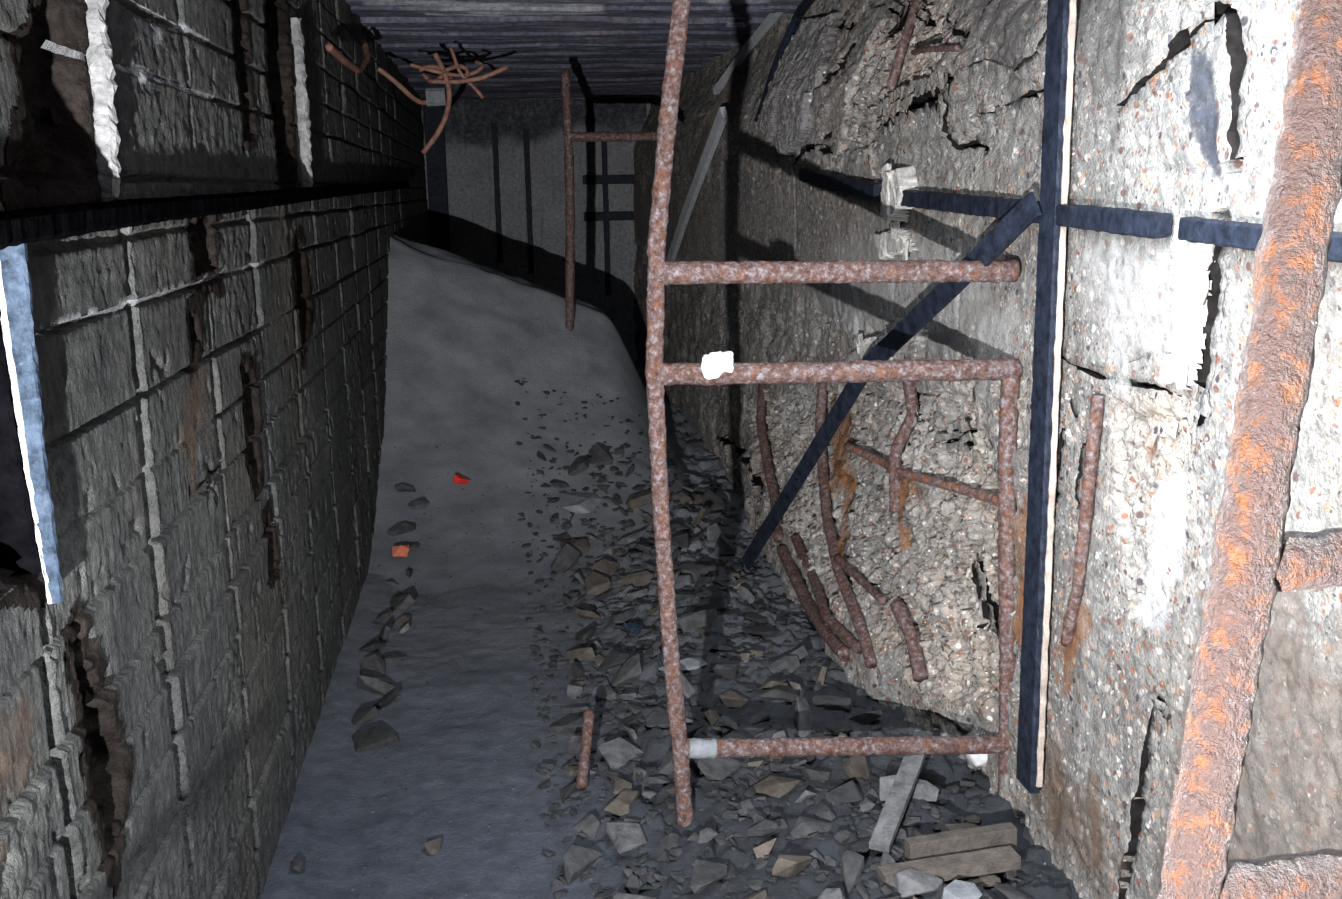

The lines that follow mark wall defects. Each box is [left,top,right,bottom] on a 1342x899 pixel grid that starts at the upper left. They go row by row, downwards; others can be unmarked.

crack [790,0,1047,174]
crack [1114,0,1252,163]
corrosion [831,415,856,555]
spalling [0,568,47,615]
corrosion [1016,506,1027,646]
spalling [60,599,134,897]